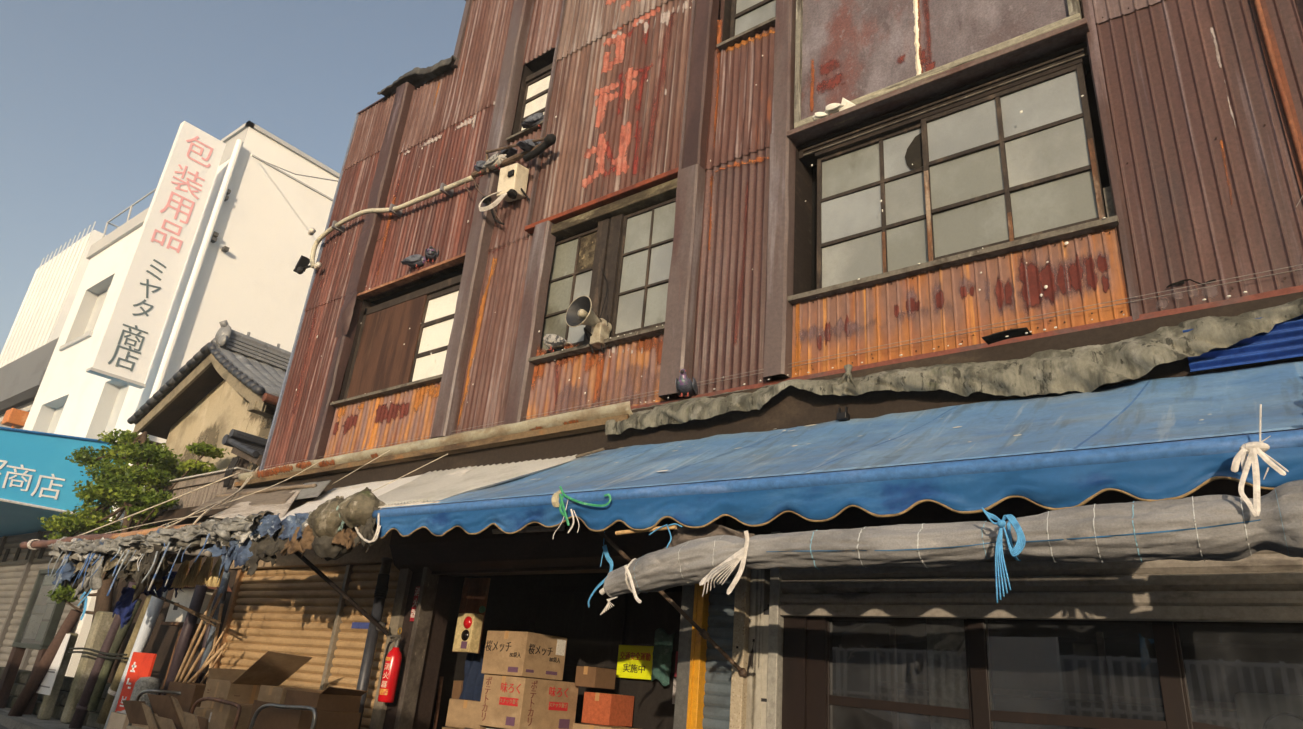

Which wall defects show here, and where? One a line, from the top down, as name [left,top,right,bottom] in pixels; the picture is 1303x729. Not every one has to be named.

rust [714,20,775,147]
rust [810,59,845,112]
rust [920,50,935,72]
rust [708,156,770,250]
rust [894,284,944,318]
rust [959,253,1110,313]
rust [532,344,605,400]
rust [636,336,663,364]
rust [795,303,864,371]
rust [333,384,440,436]